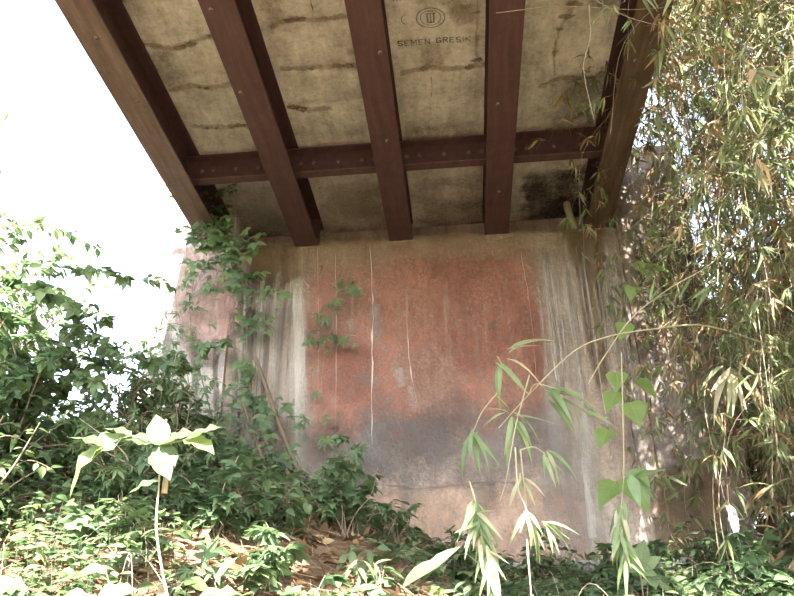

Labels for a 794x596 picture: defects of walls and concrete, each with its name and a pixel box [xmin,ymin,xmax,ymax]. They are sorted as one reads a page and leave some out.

crack [270,4,346,29]
leakage [522,169,586,220]
leakage [231,242,361,446]
rust [305,238,547,450]
leakage [446,227,629,429]
leakage [316,412,603,563]